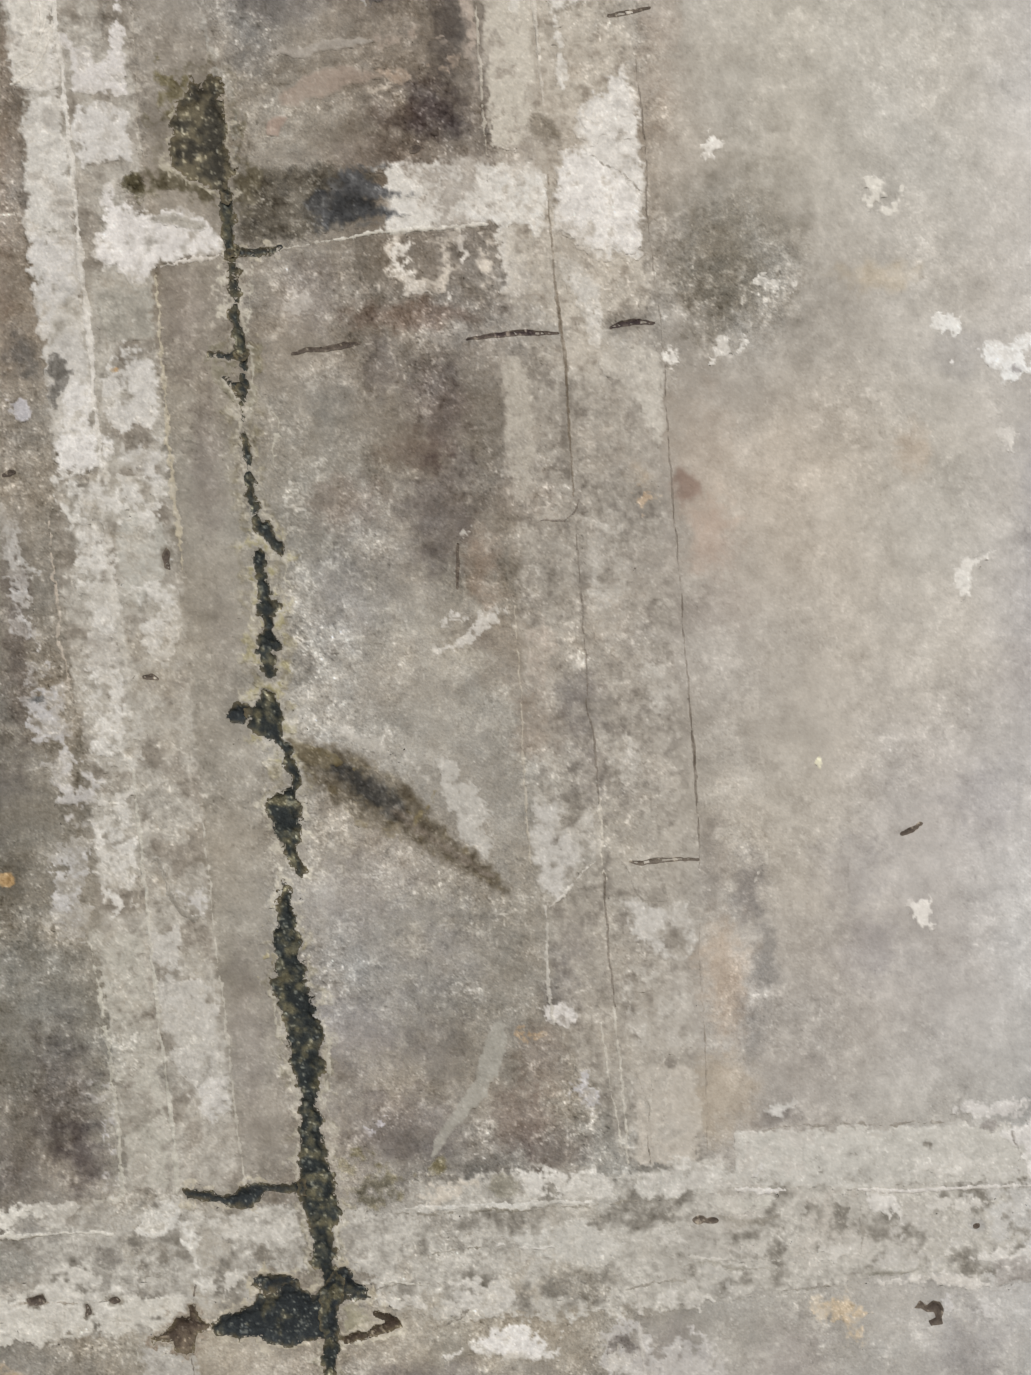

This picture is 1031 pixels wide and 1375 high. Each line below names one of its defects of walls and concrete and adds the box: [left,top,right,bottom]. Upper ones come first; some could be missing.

leakage [347,23,473,95]
leakage [301,157,427,230]
crack [177,188,464,1375]
leakage [298,732,519,902]